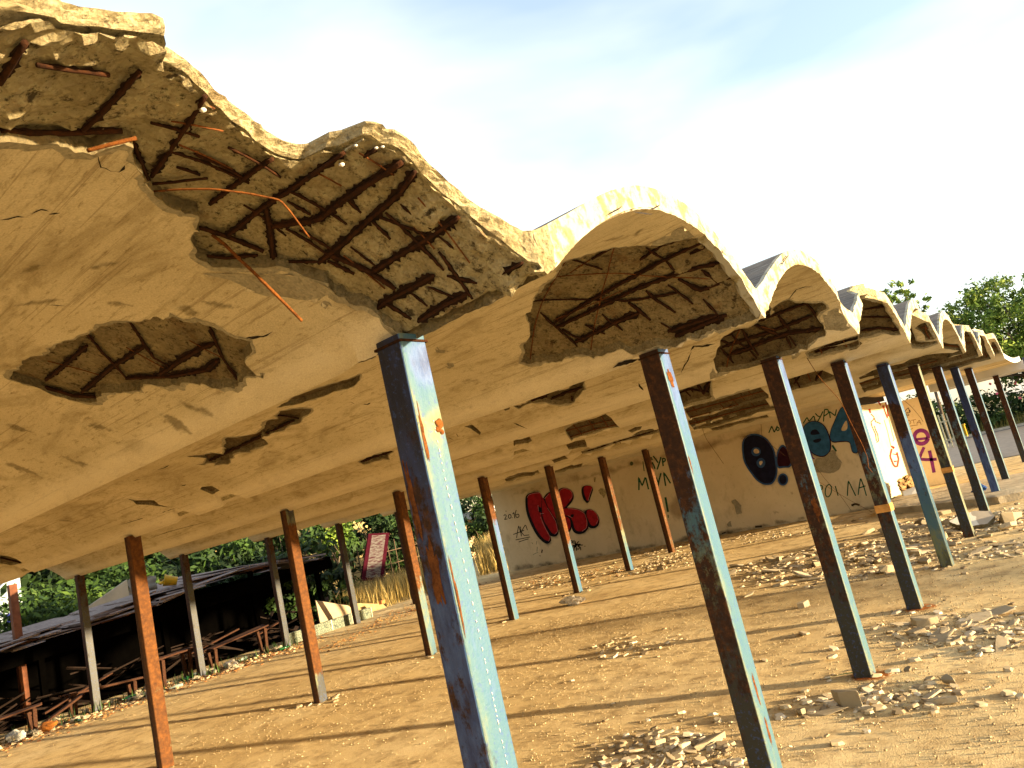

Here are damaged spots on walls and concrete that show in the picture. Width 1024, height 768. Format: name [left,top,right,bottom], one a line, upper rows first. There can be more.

spalling [0,19,1001,431]
spalling [196,374,362,466]
rust [417,403,444,460]
spalling [553,414,659,473]
rust [402,460,466,637]